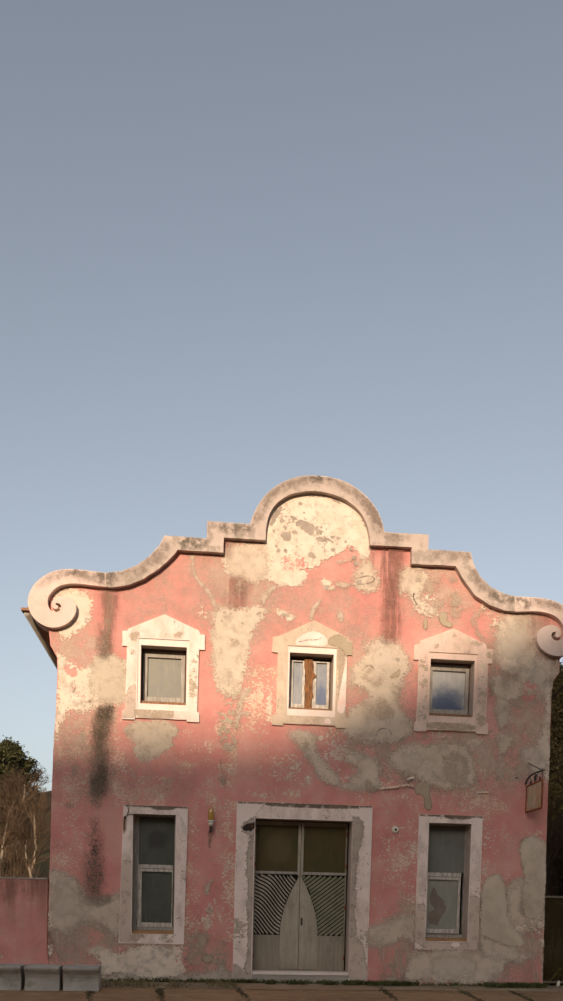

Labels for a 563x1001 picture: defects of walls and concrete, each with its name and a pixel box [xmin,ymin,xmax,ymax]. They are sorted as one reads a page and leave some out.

damp [220,476,382,531]
spalling [270,495,364,584]
peeling [285,628,328,646]
peeling [402,567,504,628]
damp [89,705,113,806]
peeling [309,657,394,806]
peeling [418,657,505,796]
peeling [51,653,317,980]
peeling [349,816,369,982]
peeling [416,883,480,949]